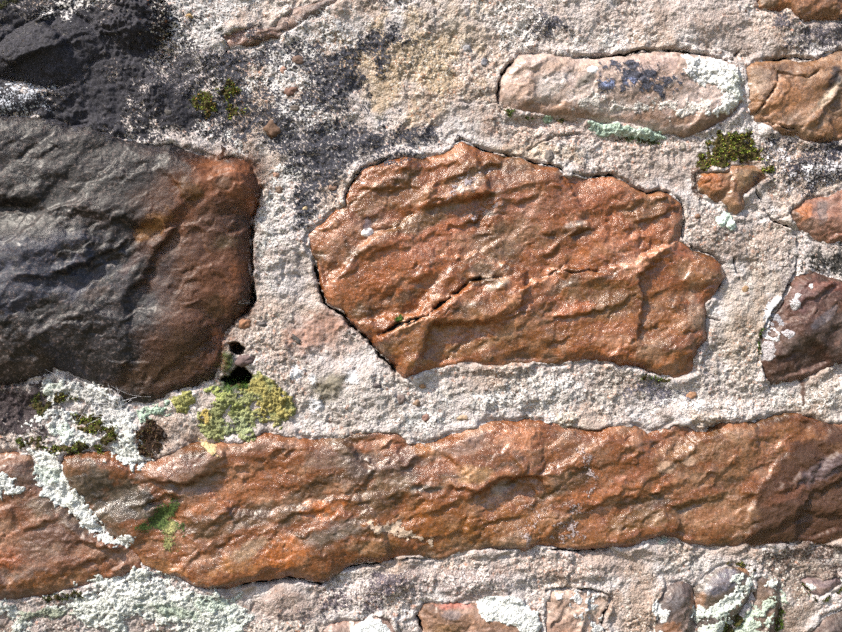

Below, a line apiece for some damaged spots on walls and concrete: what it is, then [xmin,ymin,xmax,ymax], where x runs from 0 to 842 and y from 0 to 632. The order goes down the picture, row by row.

crack [314,261,495,373]